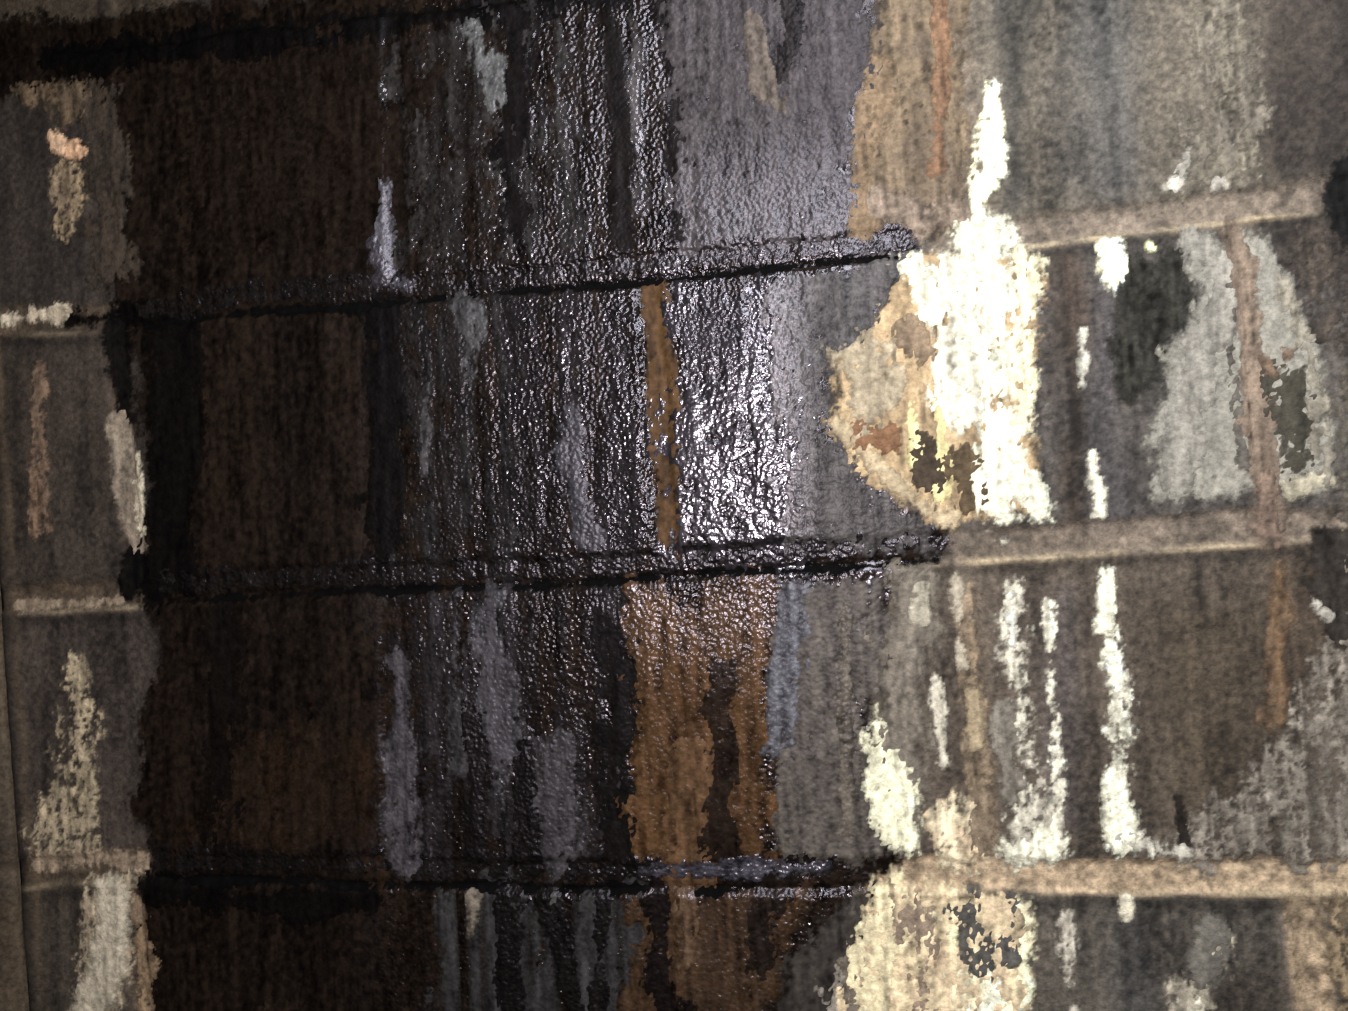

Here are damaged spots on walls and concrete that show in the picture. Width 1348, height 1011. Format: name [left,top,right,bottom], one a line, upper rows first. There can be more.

leakage [1161,0,1273,203]
leakage [0,0,1070,1011]
corrosion [640,280,683,560]
leakage [1076,327,1090,388]
leakage [1084,449,1107,519]
leakage [1094,237,1194,404]
leakage [1280,156,1348,451]
leakage [1092,470,1348,878]
leakage [1119,894,1136,922]
leakage [1323,891,1348,1011]